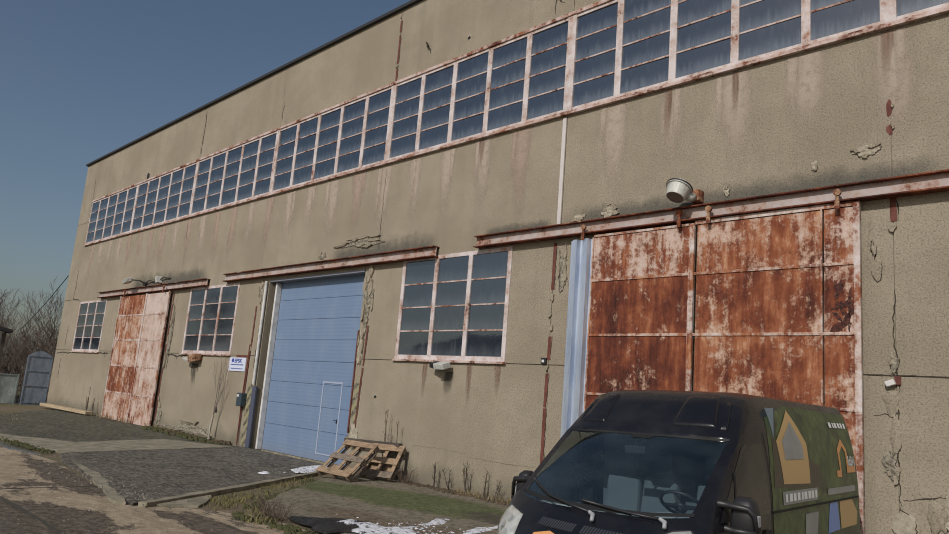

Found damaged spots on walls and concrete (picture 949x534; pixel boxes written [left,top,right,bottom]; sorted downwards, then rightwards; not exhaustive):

water stain [600,104,626,173]
water stain [716,71,749,146]
water stain [786,51,823,118]
rust [886,99,895,135]
water stain [876,28,912,115]
spalling [600,203,619,218]
spalling [318,234,385,260]
spalling [356,265,375,365]
rust [830,279,854,332]
rust [540,243,557,463]
crack [869,291,949,420]
crack [897,446,946,515]